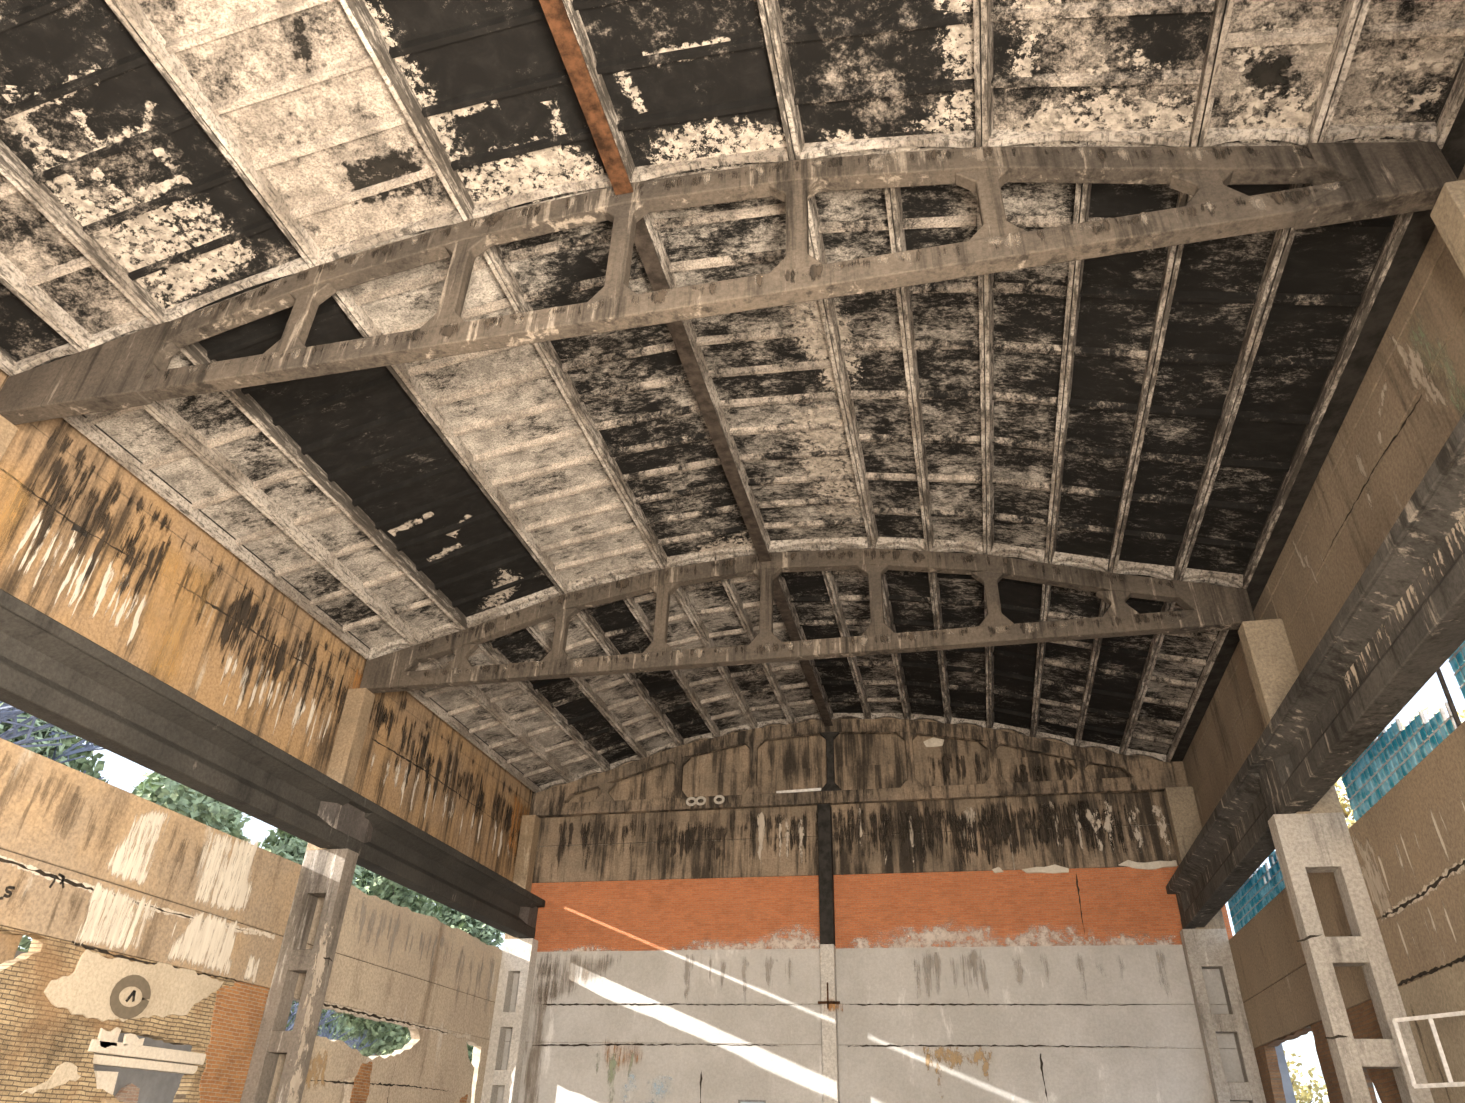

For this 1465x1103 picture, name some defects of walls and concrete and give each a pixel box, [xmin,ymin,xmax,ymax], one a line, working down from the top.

peeling [2,64,256,310]
leakage [0,429,350,745]
leakage [928,753,988,786]
leakage [1013,758,1075,782]
leakage [556,799,1171,871]
crack [0,855,275,940]
leakage [48,810,260,983]
crack [1381,858,1465,923]
crack [72,941,240,982]
crack [1398,955,1465,986]
peeling [44,949,266,1103]
peeling [20,1062,81,1095]